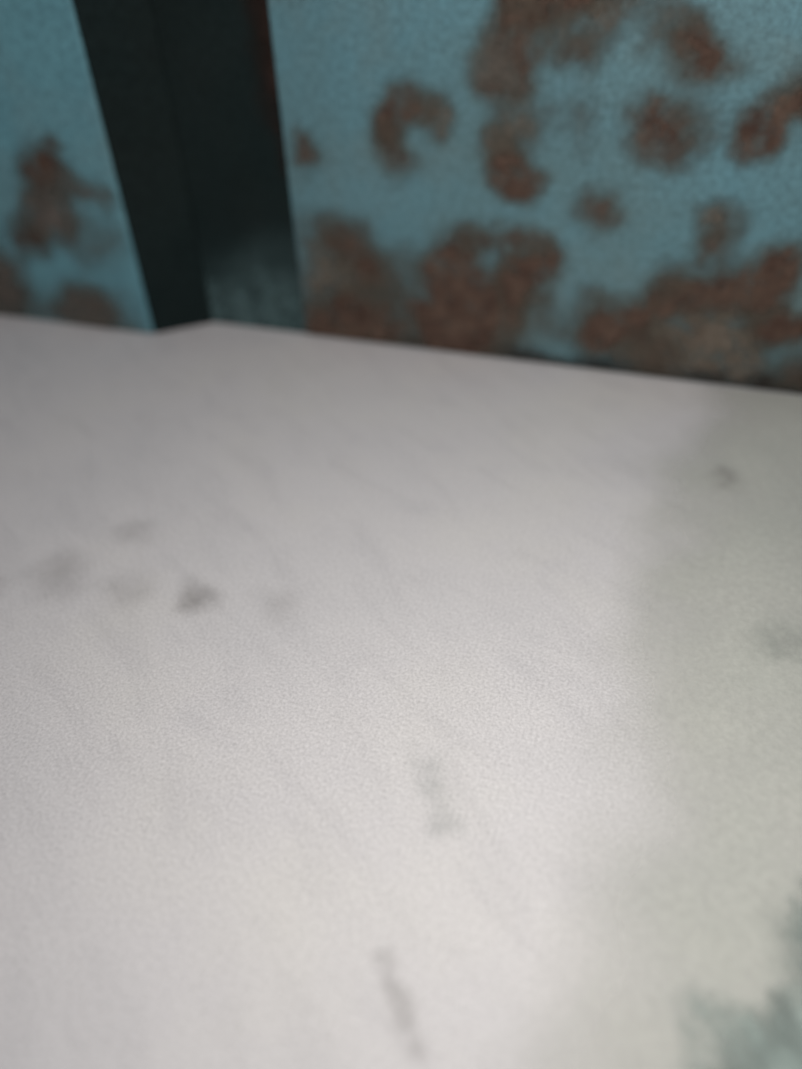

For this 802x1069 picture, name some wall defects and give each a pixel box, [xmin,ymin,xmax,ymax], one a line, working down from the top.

corrosion [251,0,279,103]
corrosion [656,6,732,80]
corrosion [374,85,452,168]
corrosion [475,0,636,202]
corrosion [632,96,693,167]
corrosion [732,85,802,163]
corrosion [12,138,107,249]
corrosion [0,254,26,317]
corrosion [48,287,135,332]
corrosion [301,223,802,394]
damp [631,388,802,1069]